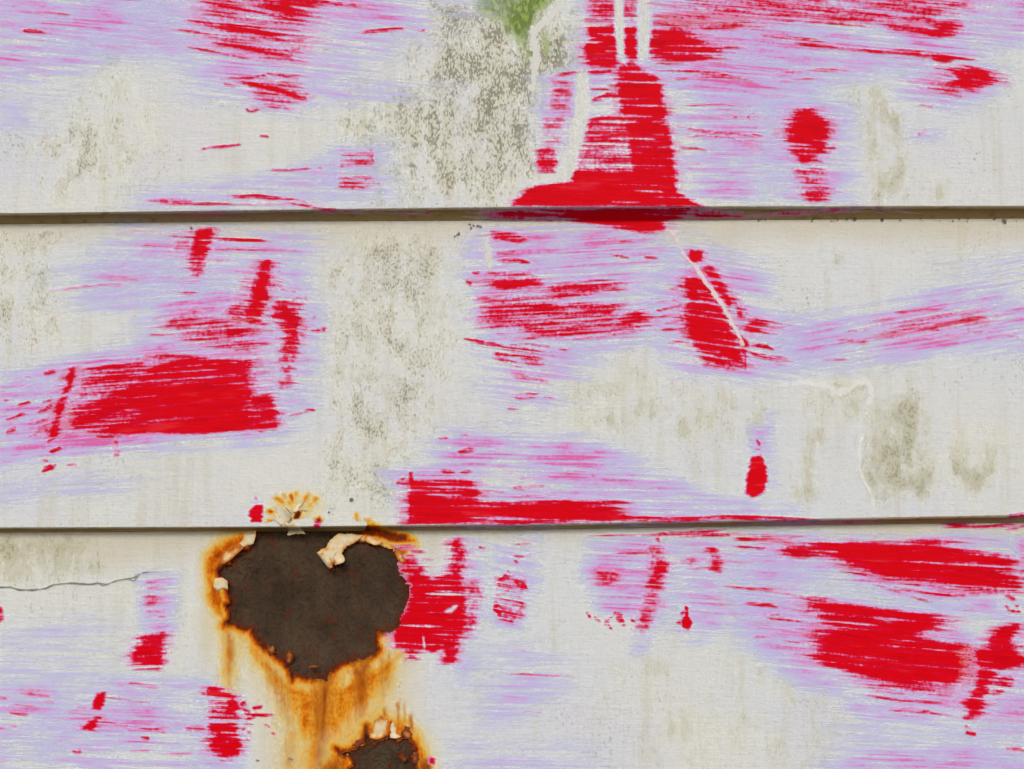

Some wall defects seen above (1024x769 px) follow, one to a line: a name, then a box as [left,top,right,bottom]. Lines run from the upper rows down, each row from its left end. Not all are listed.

damp [336,0,590,209]
damp [317,230,469,510]
damp [824,380,941,503]
damp [953,450,995,490]
peeling [218,531,256,565]
peeling [317,533,383,569]
crack [0,563,155,591]
peeling [213,578,228,592]
corrosion [201,491,435,769]